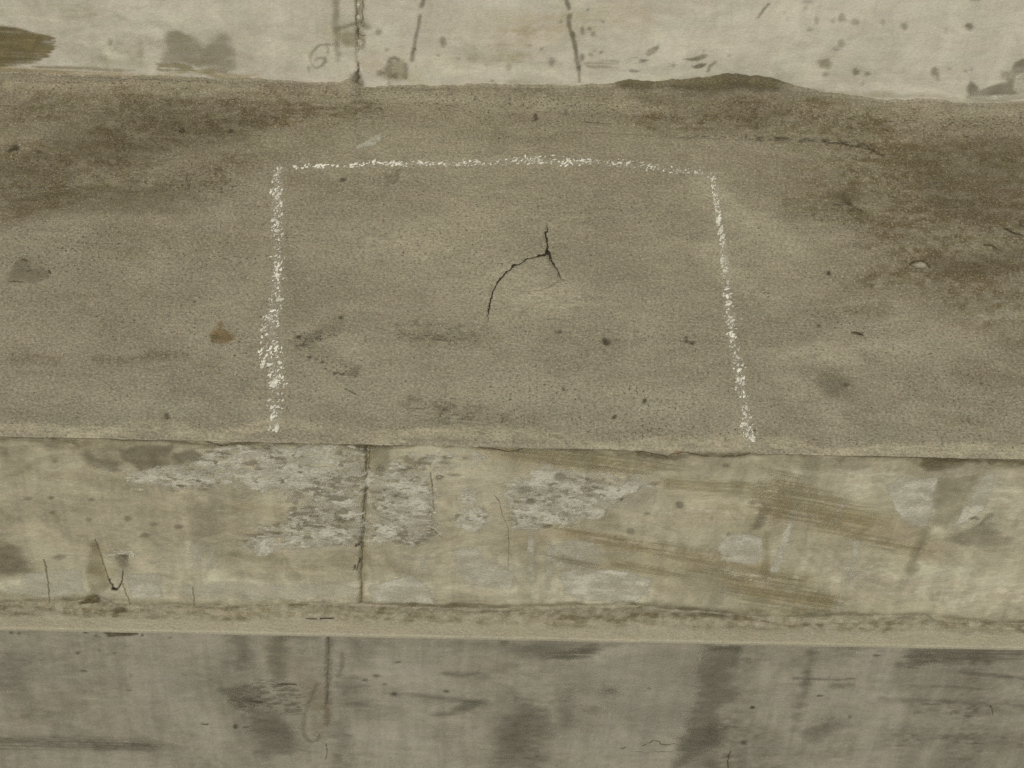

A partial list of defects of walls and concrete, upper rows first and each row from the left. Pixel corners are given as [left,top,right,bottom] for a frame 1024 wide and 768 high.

crack [487,227,561,319]
crack [356,445,370,601]